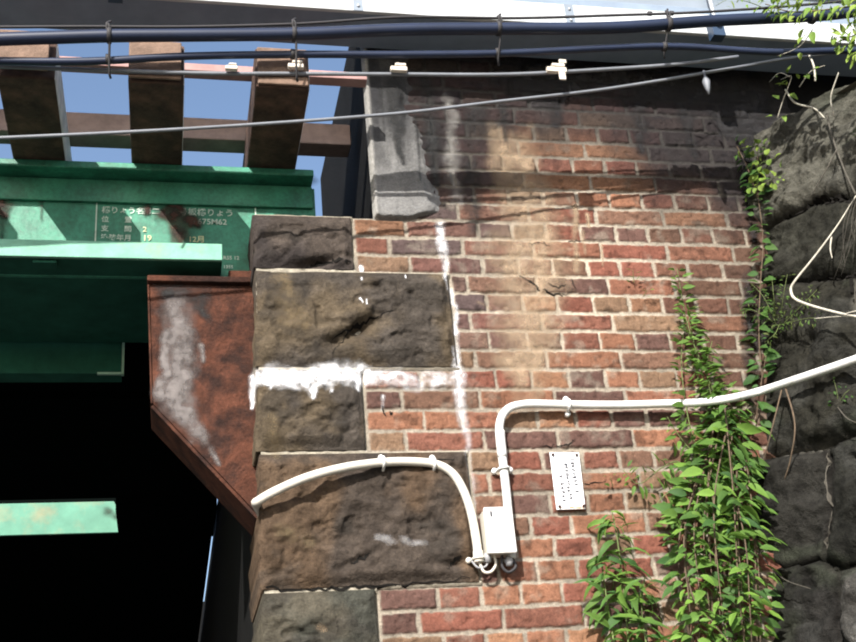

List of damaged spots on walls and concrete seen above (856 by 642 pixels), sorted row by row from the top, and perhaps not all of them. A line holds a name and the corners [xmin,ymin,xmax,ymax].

corrosion [0,200,10,218]
corrosion [144,204,201,243]
crack [519,275,576,297]
crack [332,309,395,358]
damp [250,364,399,409]